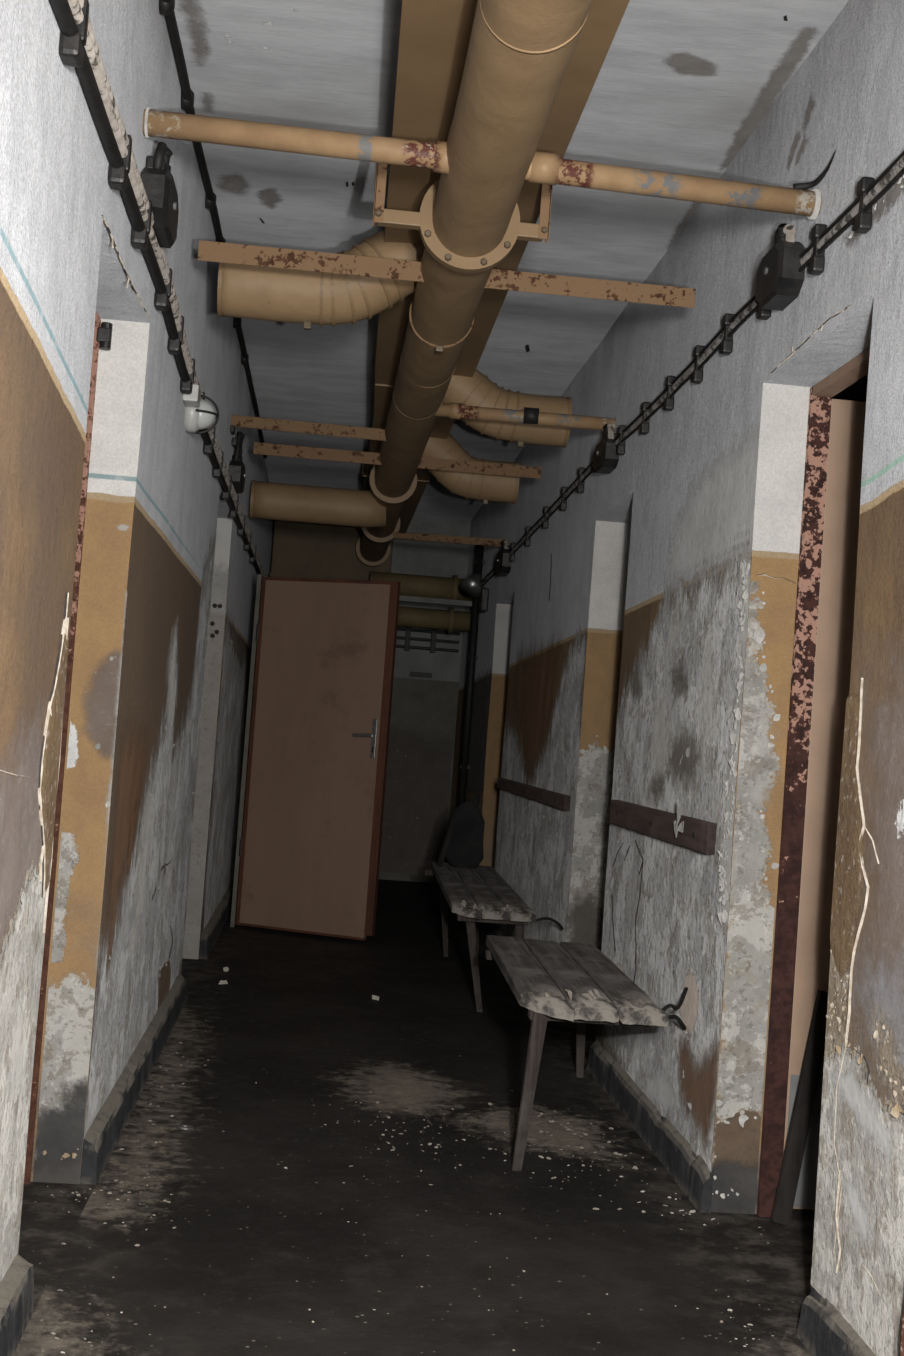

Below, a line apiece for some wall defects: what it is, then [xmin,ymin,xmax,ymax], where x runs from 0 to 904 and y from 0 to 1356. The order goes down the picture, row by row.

crack [38,592,69,933]
peeling [0,529,247,1283]
peeling [493,539,781,1199]
peeling [811,1004,904,1356]
crack [833,678,904,1296]
spalling [895,796,904,839]